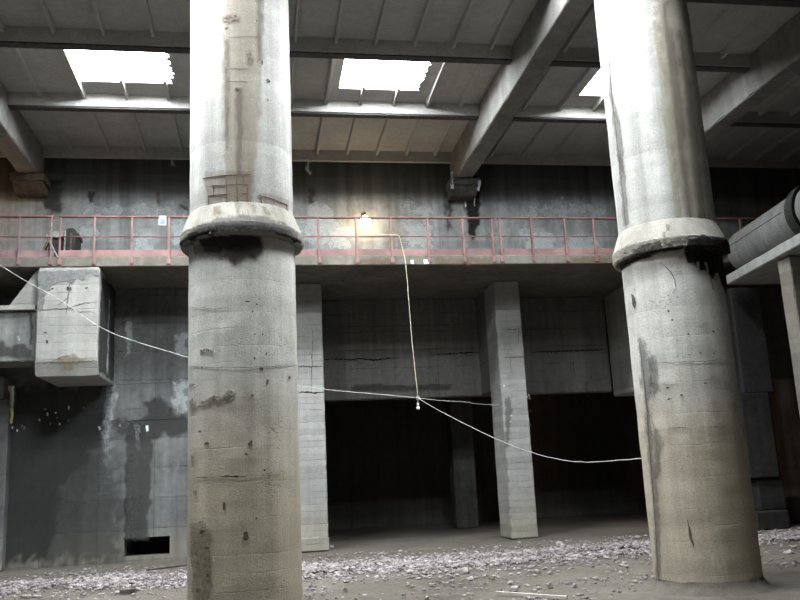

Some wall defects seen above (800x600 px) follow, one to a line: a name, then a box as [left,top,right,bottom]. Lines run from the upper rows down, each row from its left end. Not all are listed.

damp [445,171,454,231]
damp [464,180,482,239]
spalling [684,235,731,296]
crack [115,330,400,394]
damp [5,277,188,566]
spalling [189,389,234,411]